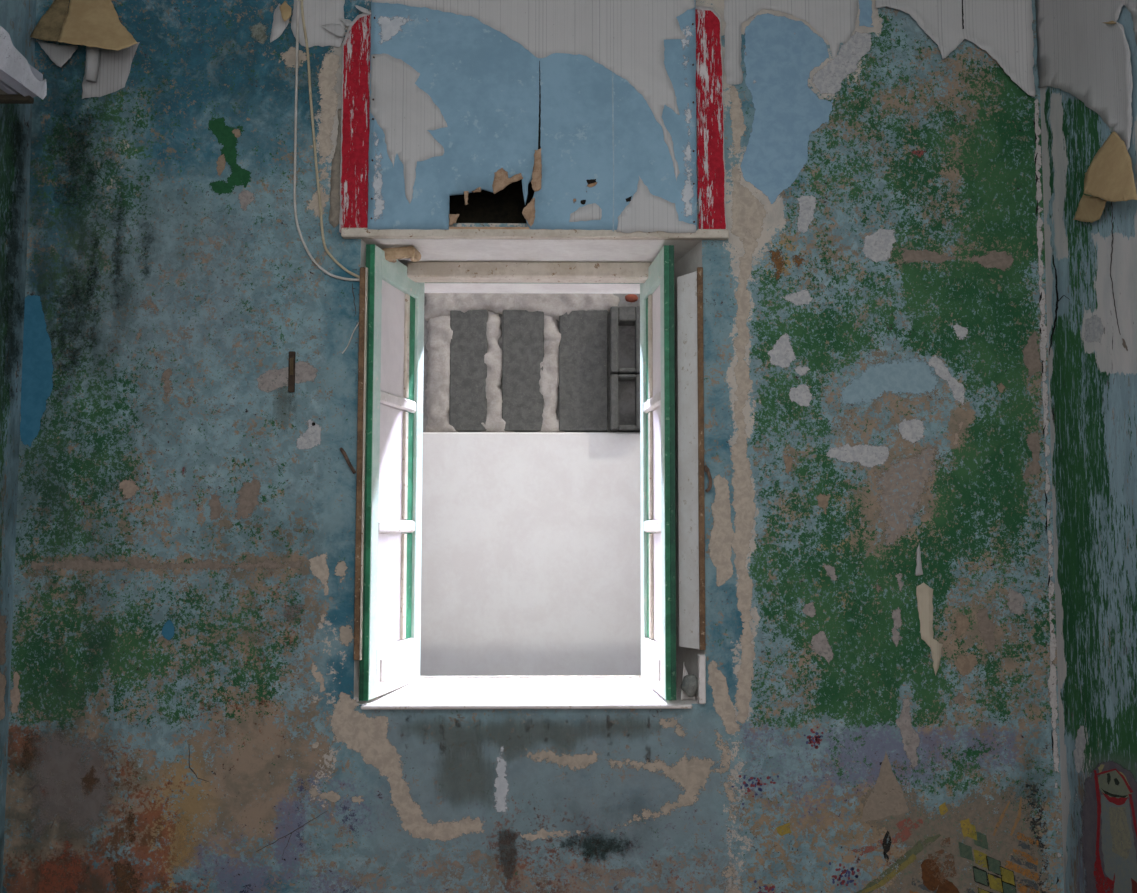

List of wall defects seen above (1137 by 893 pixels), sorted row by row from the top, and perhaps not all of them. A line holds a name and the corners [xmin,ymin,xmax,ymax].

water stain [52,237,100,397]
water stain [499,831,516,878]
water stain [561,833,629,860]